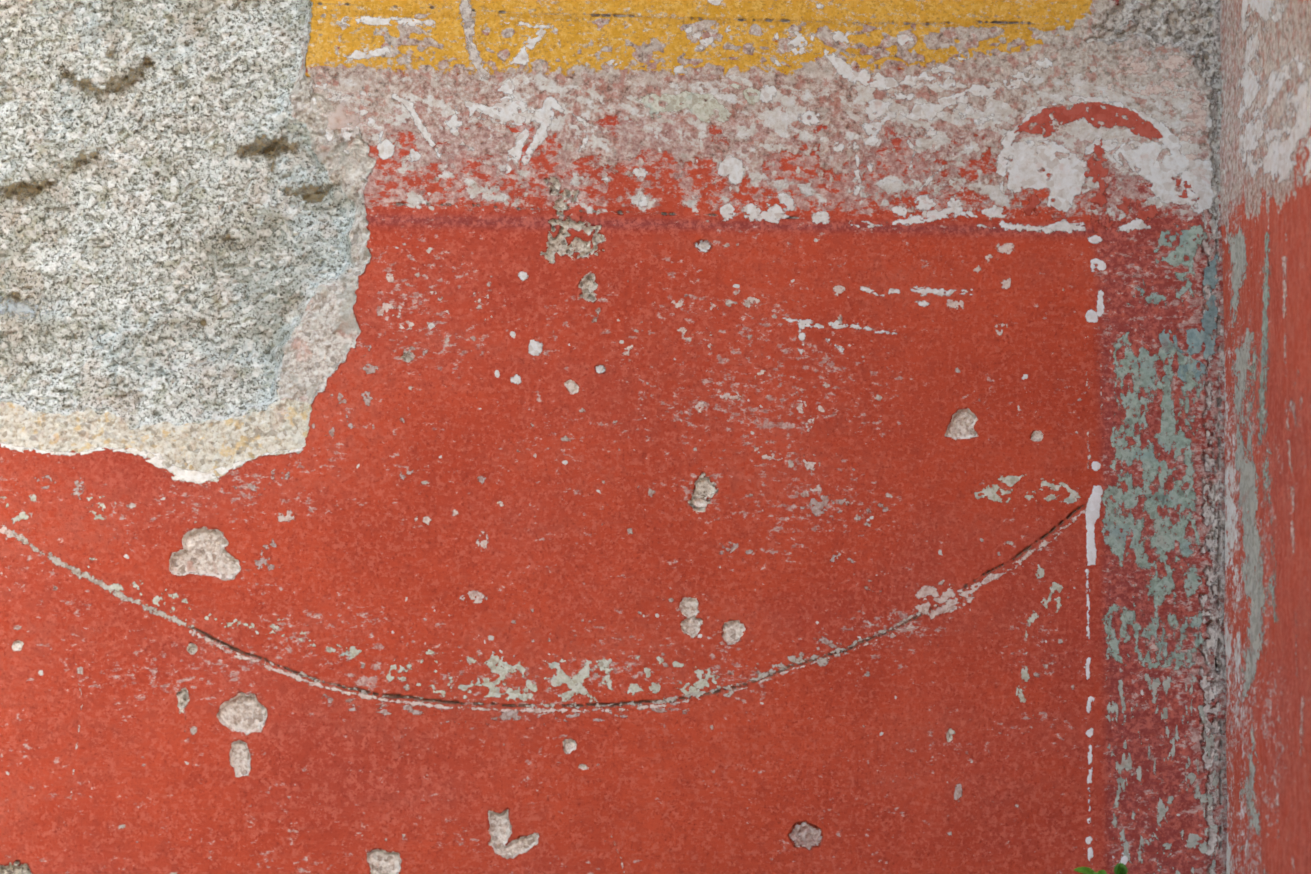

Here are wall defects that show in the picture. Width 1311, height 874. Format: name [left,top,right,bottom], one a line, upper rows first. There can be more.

peeling [445,21,588,173]
peeling [774,30,1053,195]
flaking render [0,0,441,495]
spalling [540,177,606,302]
peeling [720,193,796,223]
flaking render [849,0,1311,874]
spalling [169,526,280,581]
crack [0,503,1087,713]
spalling [722,620,746,645]
spalling [217,692,267,777]
spalling [367,849,402,874]
spalling [488,809,539,860]